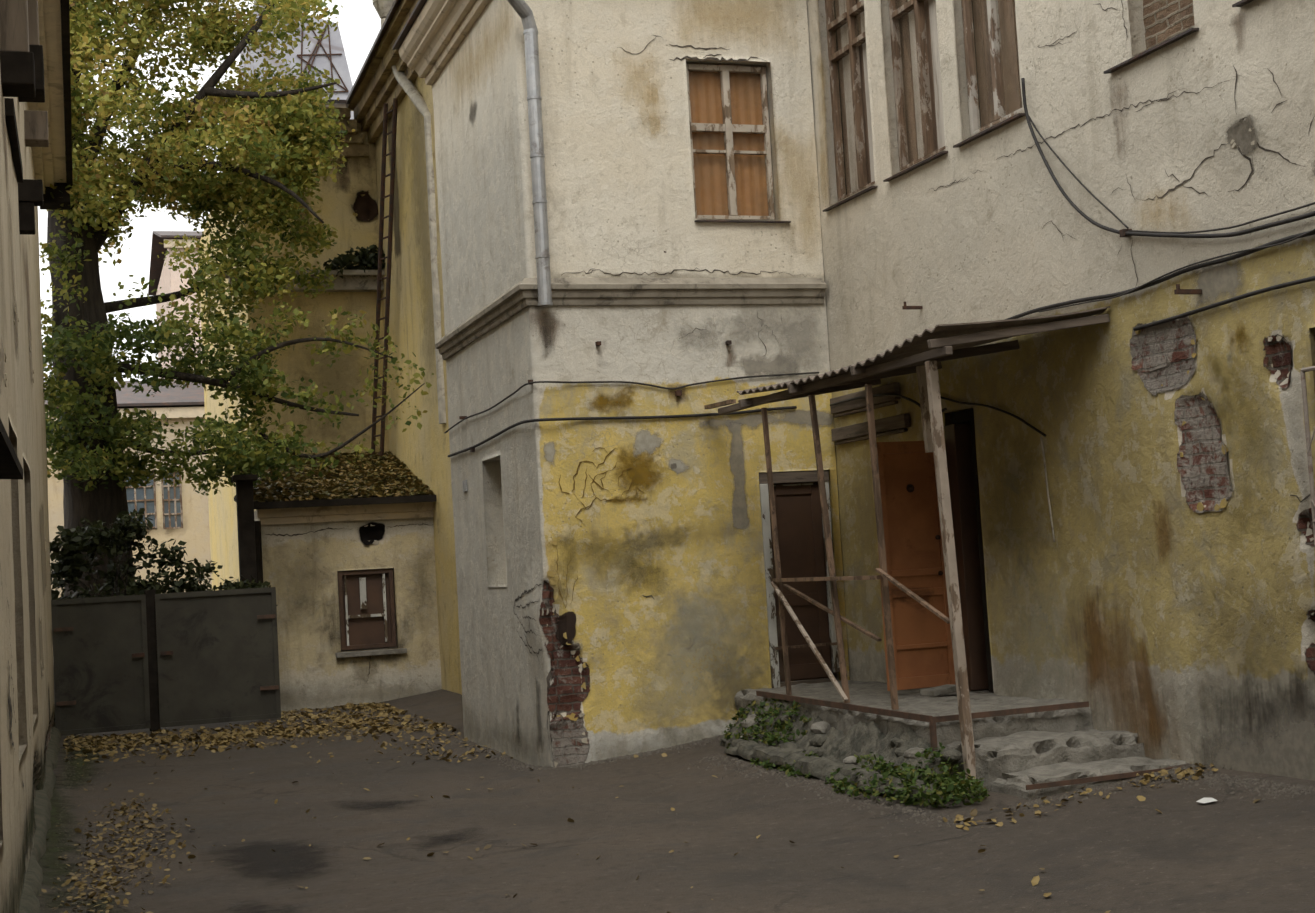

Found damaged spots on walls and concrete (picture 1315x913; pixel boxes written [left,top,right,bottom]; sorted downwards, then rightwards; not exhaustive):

crack [617,35,763,62]
crack [931,66,1305,202]
crack [562,268,814,276]
flaking render [1263,334,1292,389]
flaking render [1130,317,1232,513]
peeling [634,430,662,456]
water stain [611,450,660,503]
flaking render [1290,494,1314,545]
crack [514,447,644,767]
flaking render [539,571,590,768]
flaking render [1305,643,1315,674]